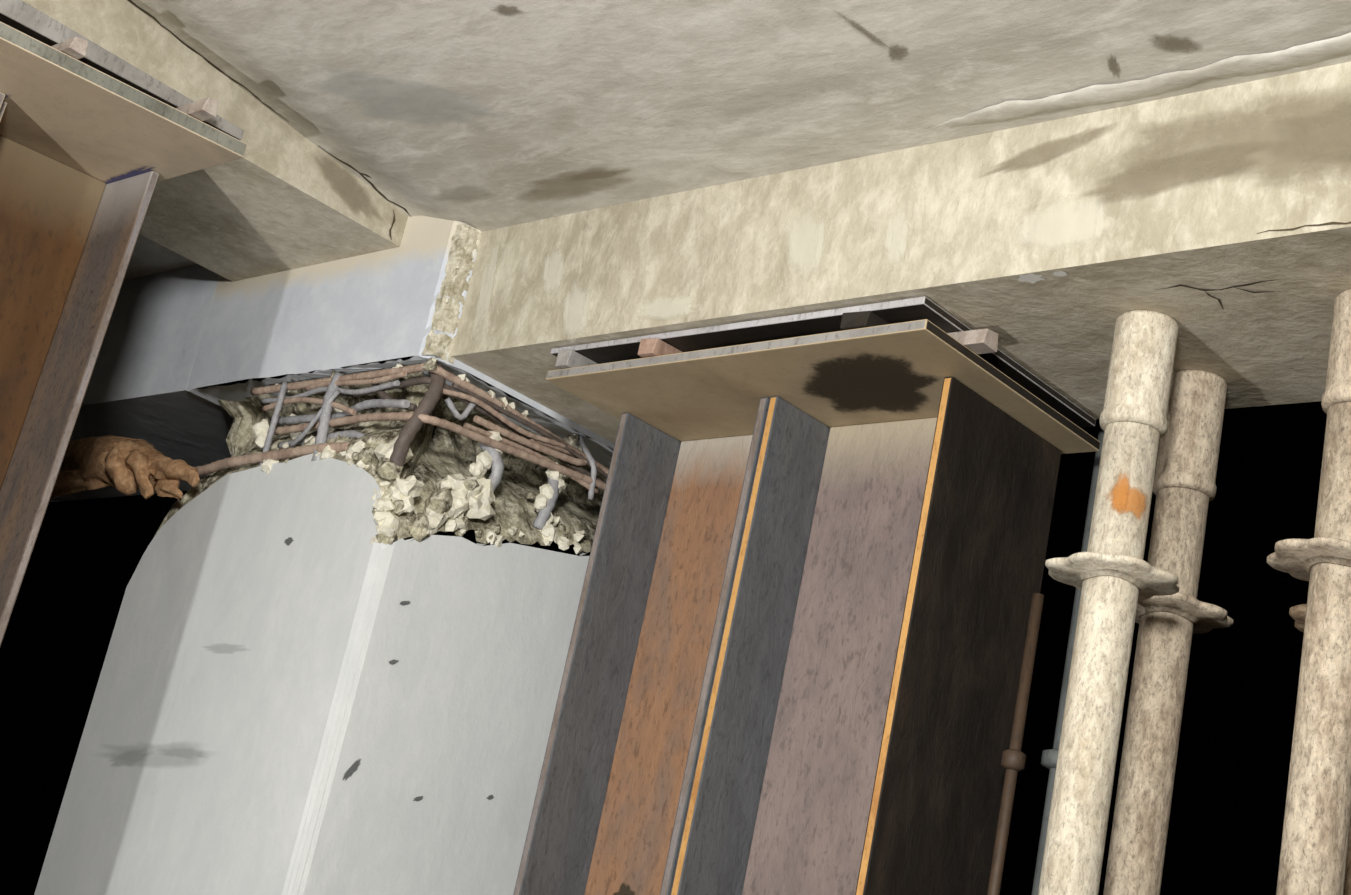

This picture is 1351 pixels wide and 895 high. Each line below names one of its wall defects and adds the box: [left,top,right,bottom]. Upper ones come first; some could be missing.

water stain [844,18,886,46]
crack [1257,221,1351,234]
crack [1157,279,1279,310]
spalling [152,224,609,554]
rust [1112,477,1145,518]